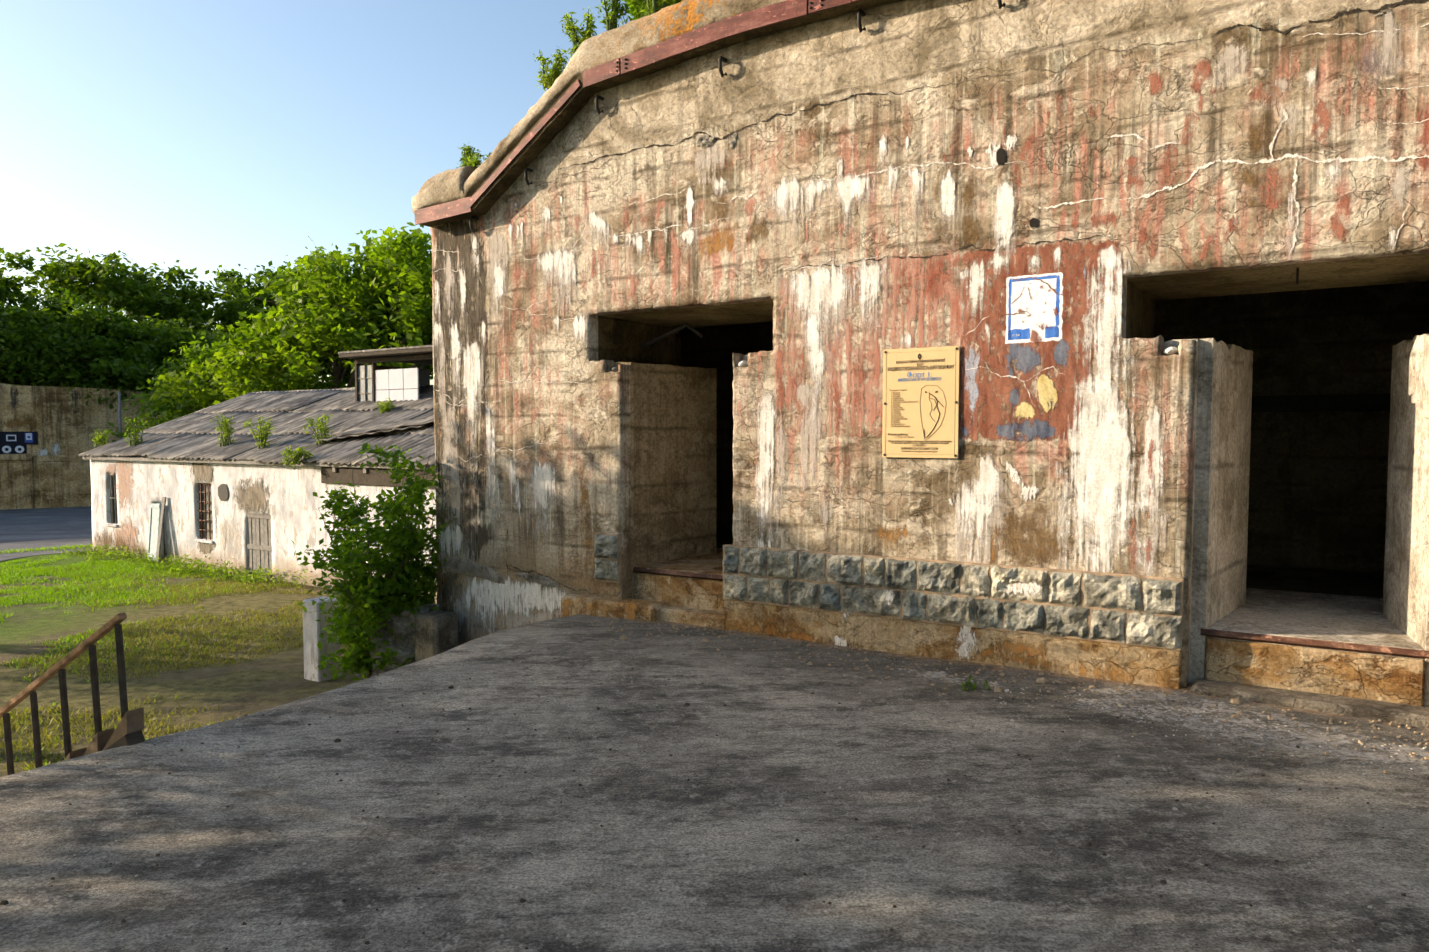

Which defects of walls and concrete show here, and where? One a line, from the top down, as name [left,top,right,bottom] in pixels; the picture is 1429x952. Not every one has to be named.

crack [558,0,1429,176]
spalling [696,132,741,157]
peeling [1120,156,1142,188]
crack [523,85,1429,334]
peeling [775,212,1122,441]
crack [965,363,1065,407]
peeling [1006,461,1039,501]